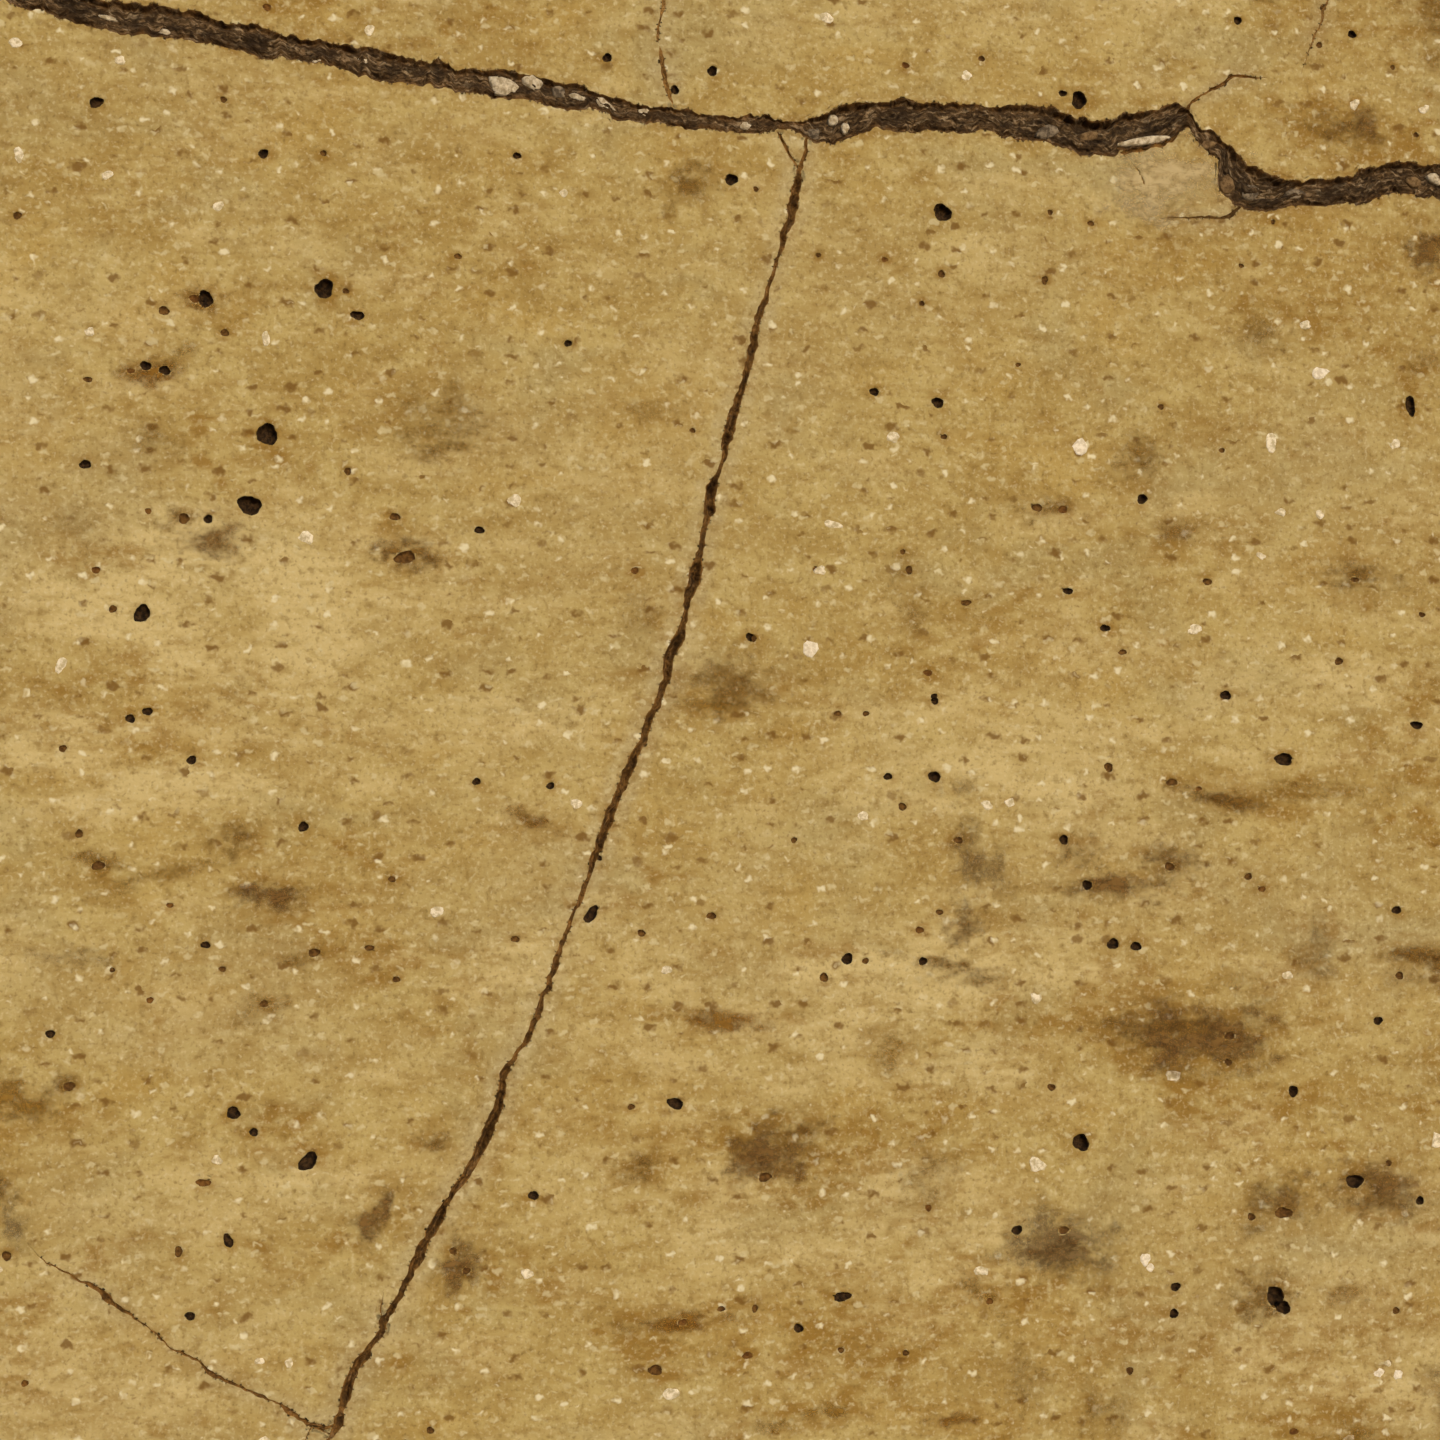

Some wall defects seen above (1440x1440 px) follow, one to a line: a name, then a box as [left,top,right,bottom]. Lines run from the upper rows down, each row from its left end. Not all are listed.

crack [3,0,1440,224]
crack [23,132,812,1440]